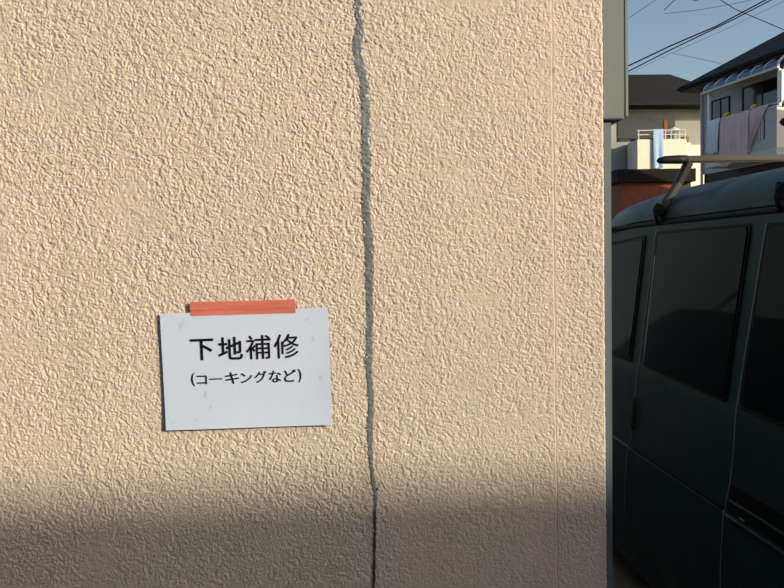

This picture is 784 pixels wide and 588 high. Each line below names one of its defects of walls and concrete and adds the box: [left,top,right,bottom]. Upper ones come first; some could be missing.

crack [351,0,381,588]